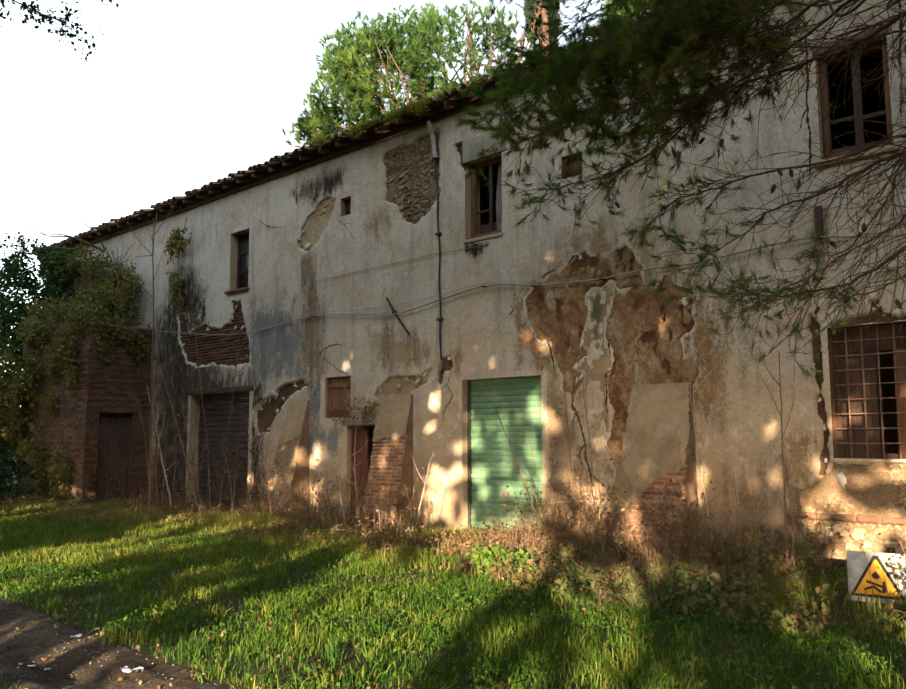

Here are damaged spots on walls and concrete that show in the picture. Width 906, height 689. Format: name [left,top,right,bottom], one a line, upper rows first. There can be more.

spalling [383,129,441,224]
peeling [296,198,336,251]
spalling [178,301,251,367]
spalling [257,380,309,432]
spalling [361,356,453,420]
peeling [525,245,699,518]
spalling [787,458,906,569]